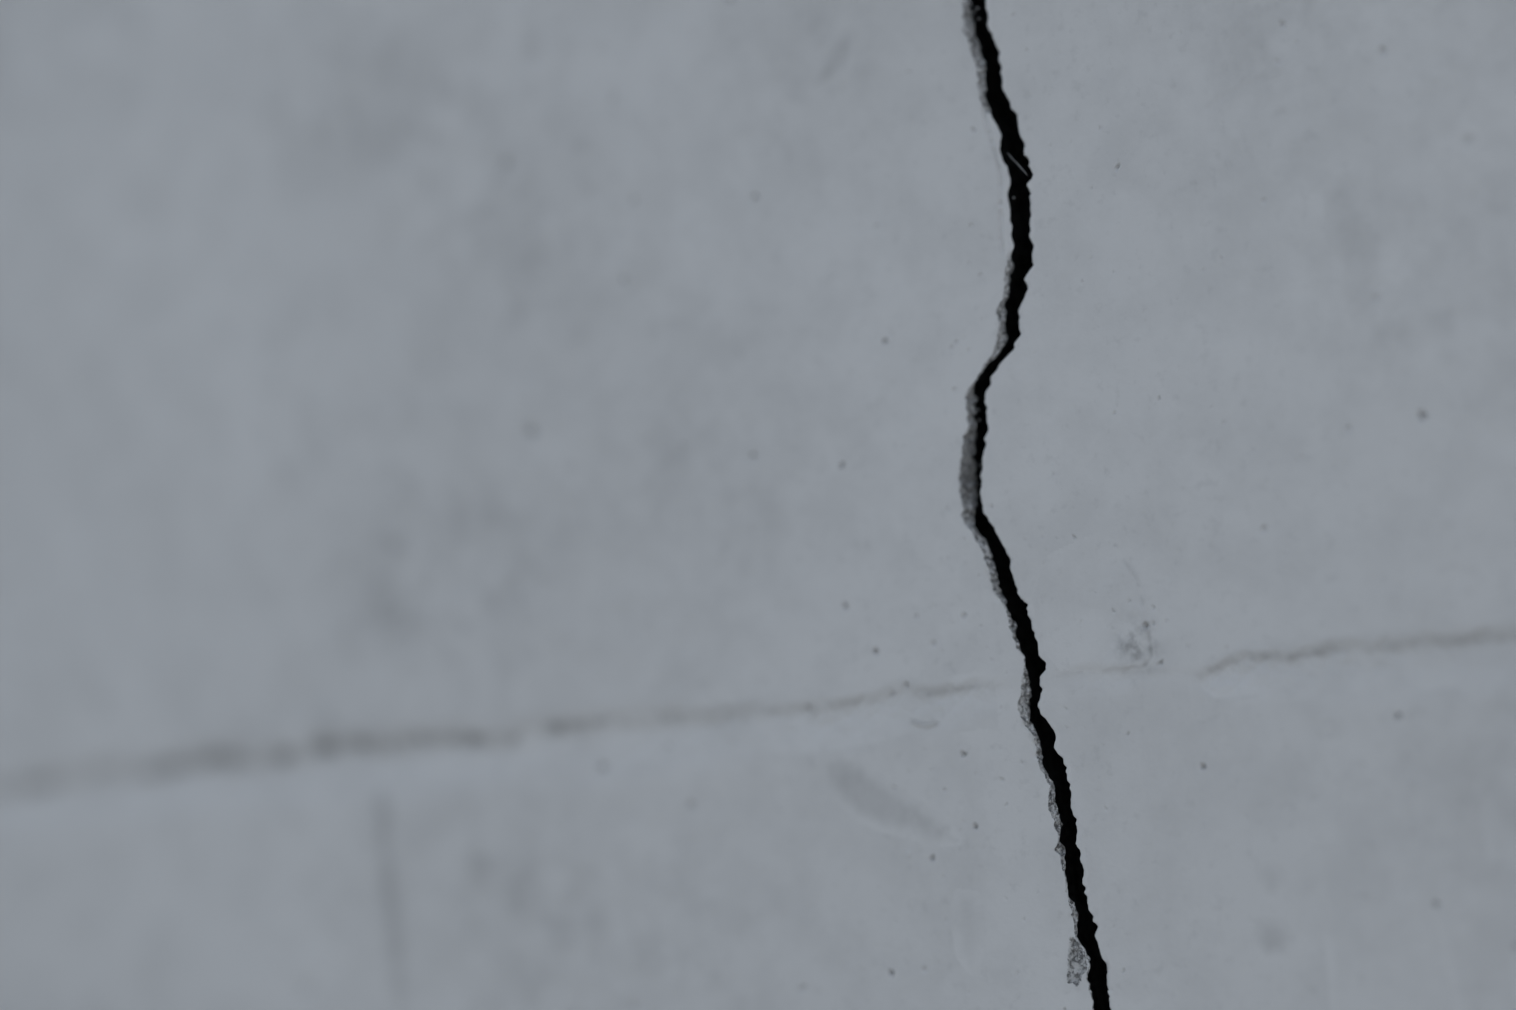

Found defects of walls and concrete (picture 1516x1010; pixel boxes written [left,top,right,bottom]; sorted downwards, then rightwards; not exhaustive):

crack [952,0,1115,1010]